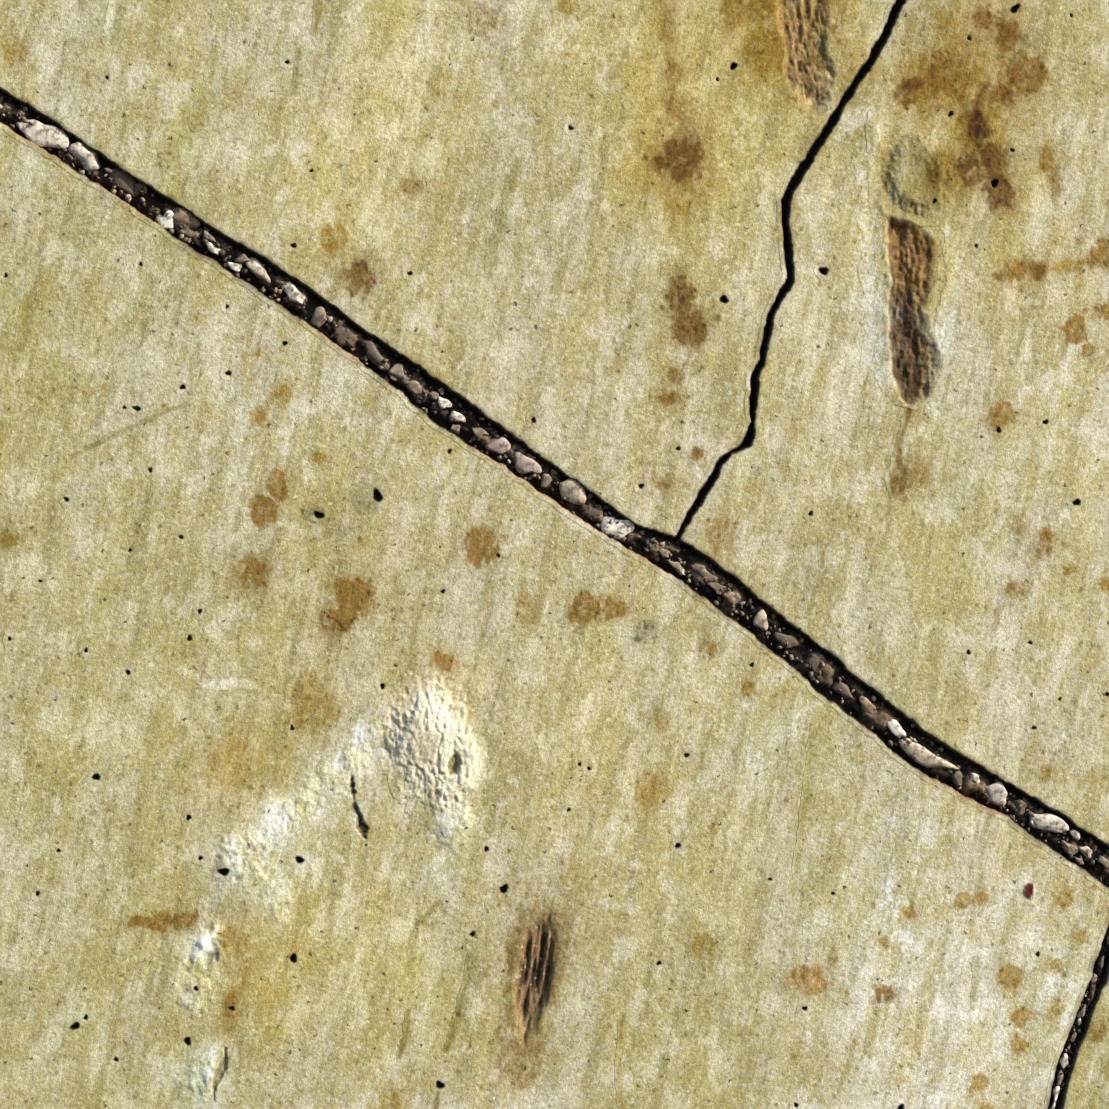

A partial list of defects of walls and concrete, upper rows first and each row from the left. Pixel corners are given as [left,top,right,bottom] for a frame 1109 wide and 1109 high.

rust [709,0,824,156]
rust [823,0,1109,364]
rust [594,0,760,413]
crack [524,473,541,481]
crack [644,537,658,552]
crack [685,564,695,583]
crack [725,583,733,594]
crack [739,598,754,610]
crack [808,672,819,684]
crack [1043,912,1109,1109]